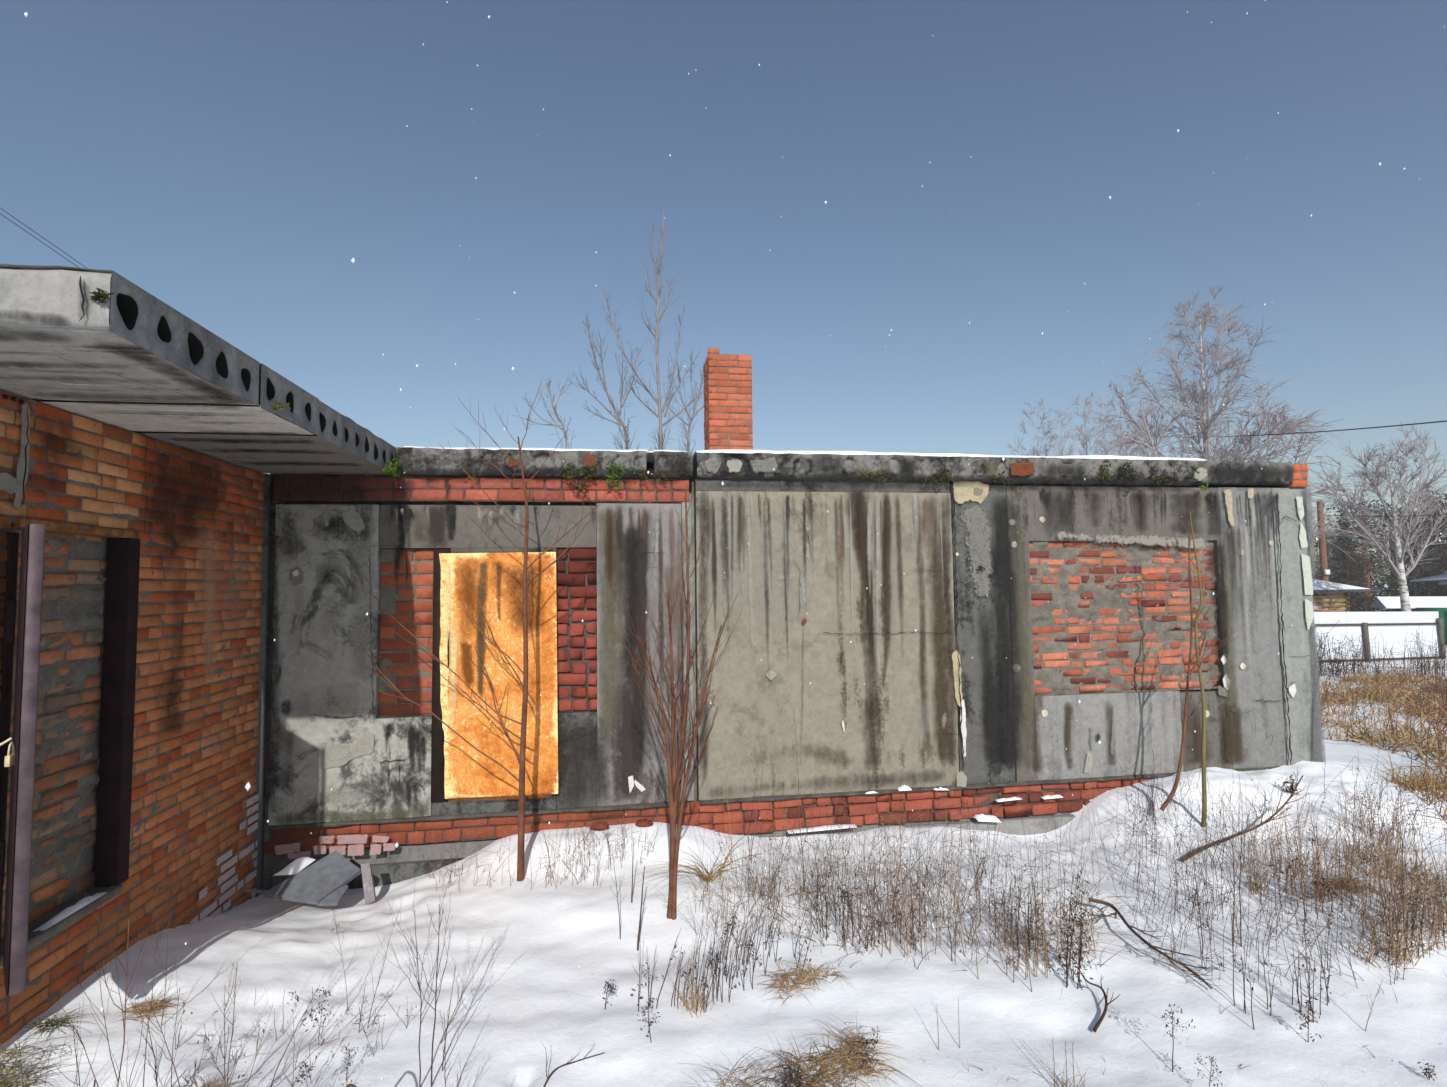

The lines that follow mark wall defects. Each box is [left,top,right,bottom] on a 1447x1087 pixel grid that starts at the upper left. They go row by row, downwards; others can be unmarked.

leakage [0,312,358,509]
leakage [319,512,369,541]
leakage [390,503,456,582]
leakage [415,456,689,477]
spalling [953,481,993,596]
leakage [190,519,298,924]
leakage [279,723,426,824]
corrosion [461,562,537,694]
corrosion [452,793,550,801]
leakage [566,508,674,801]
peeling [952,650,967,787]
leakage [700,458,1291,784]